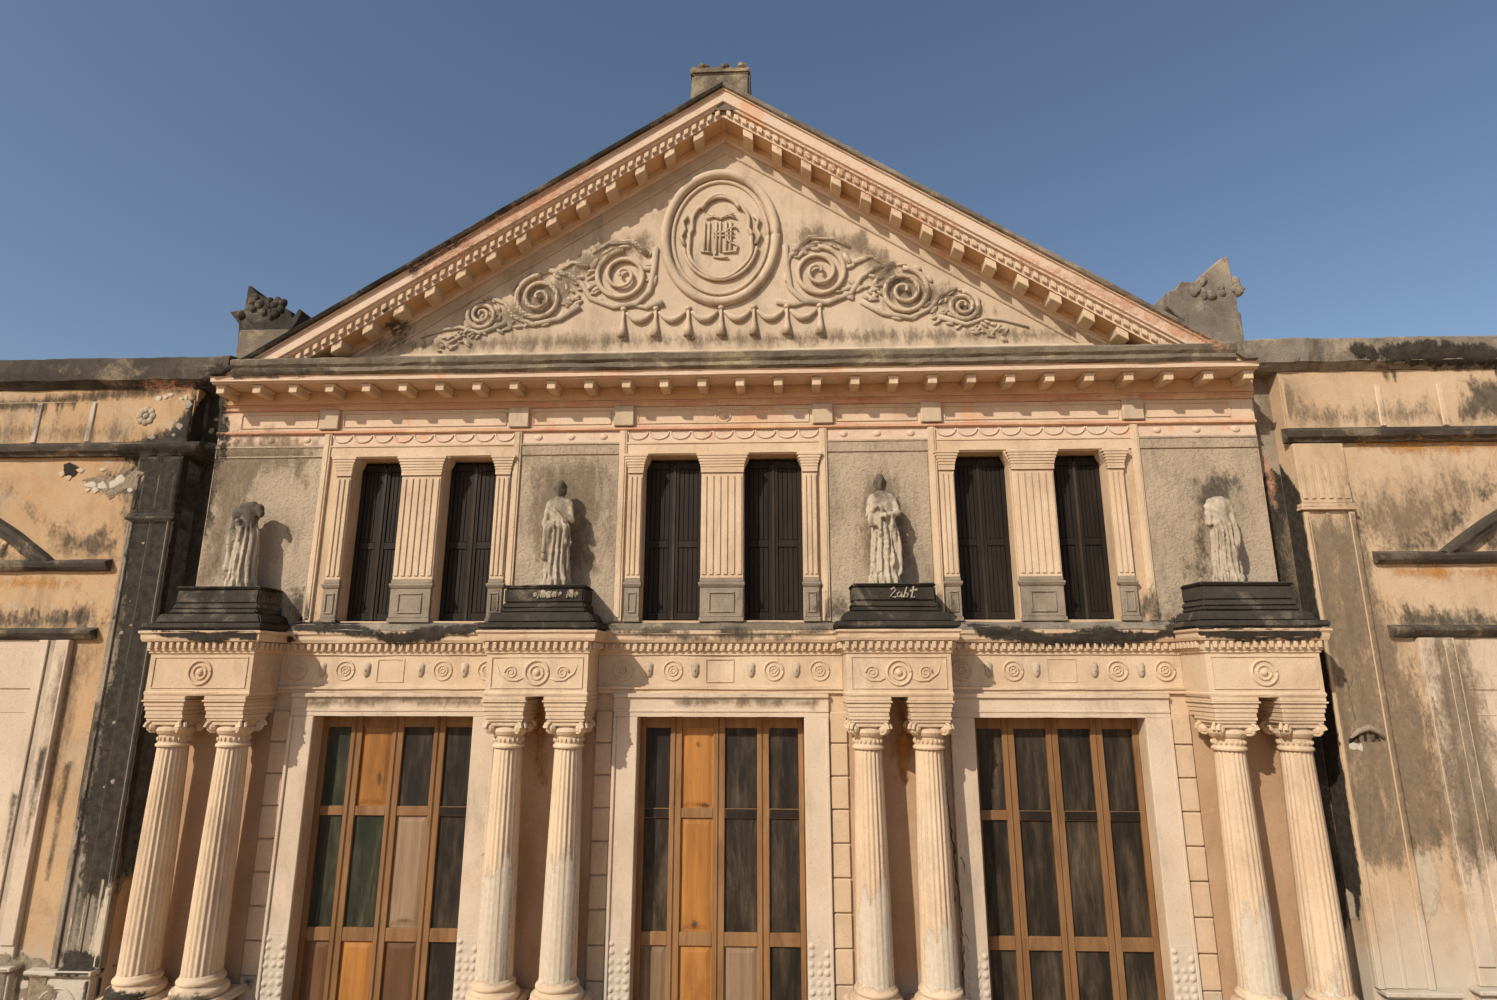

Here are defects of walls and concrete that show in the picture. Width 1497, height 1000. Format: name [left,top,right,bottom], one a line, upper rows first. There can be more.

water stain [1350,339,1497,421]
flaking render [58,462,144,499]
water stain [1346,479,1492,553]
water stain [1400,605,1497,634]
water stain [0,364,327,1000]
flaking render [0,952,57,1000]